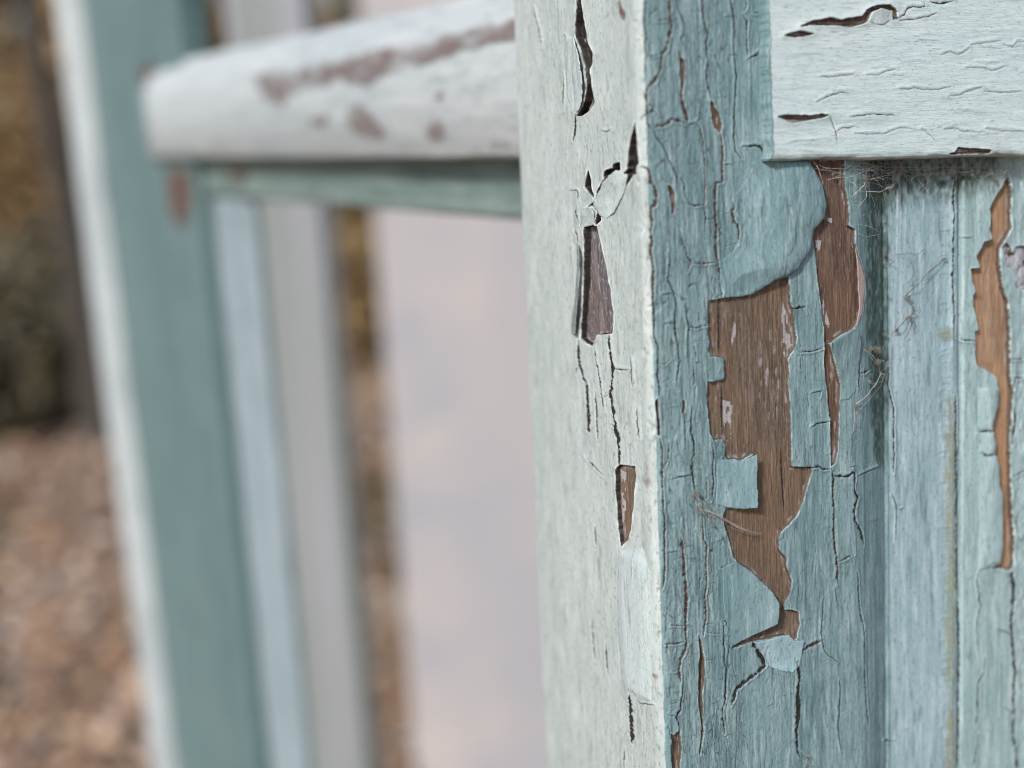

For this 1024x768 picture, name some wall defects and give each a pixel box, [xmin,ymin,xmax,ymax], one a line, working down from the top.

peeling [565,22,595,115]
peeling [571,142,639,343]
peeling [620,465,636,542]
crack [576,0,766,765]
peeling [707,278,809,672]
peeling [808,160,866,464]
crack [780,368,895,757]
crack [819,41,1024,141]
crack [900,1,952,20]
peeling [970,182,1024,571]